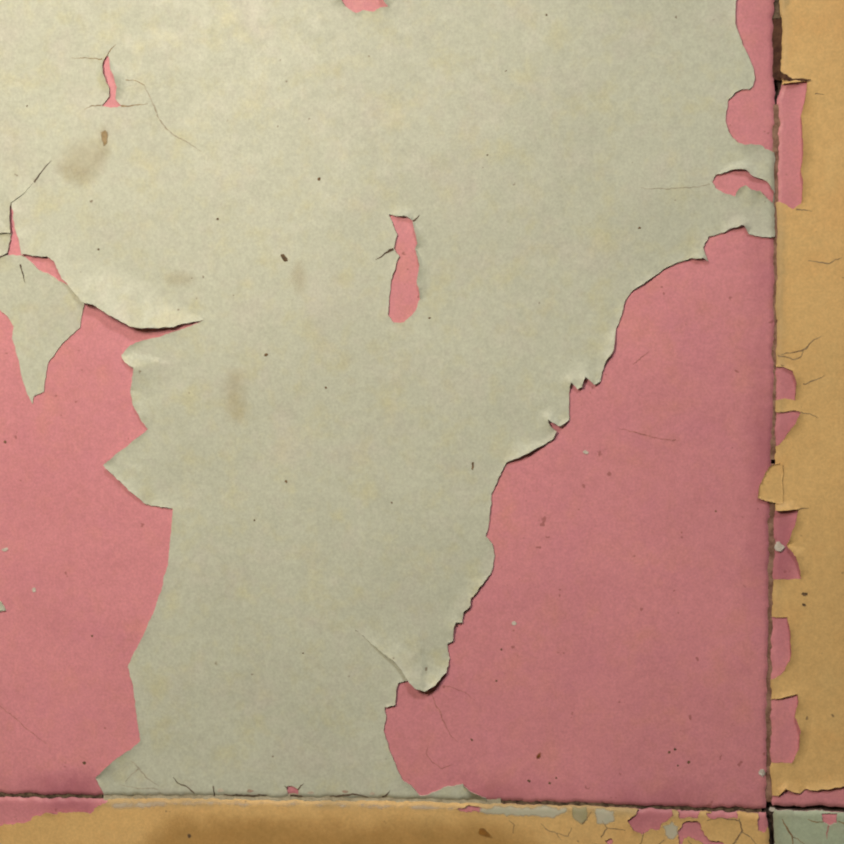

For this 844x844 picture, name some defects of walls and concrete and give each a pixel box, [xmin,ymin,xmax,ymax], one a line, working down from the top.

peeling [322,0,396,13]
crack [121,80,200,151]
peeling [357,0,844,844]
peeling [0,161,204,826]
crack [541,812,664,844]
crack [707,817,756,844]